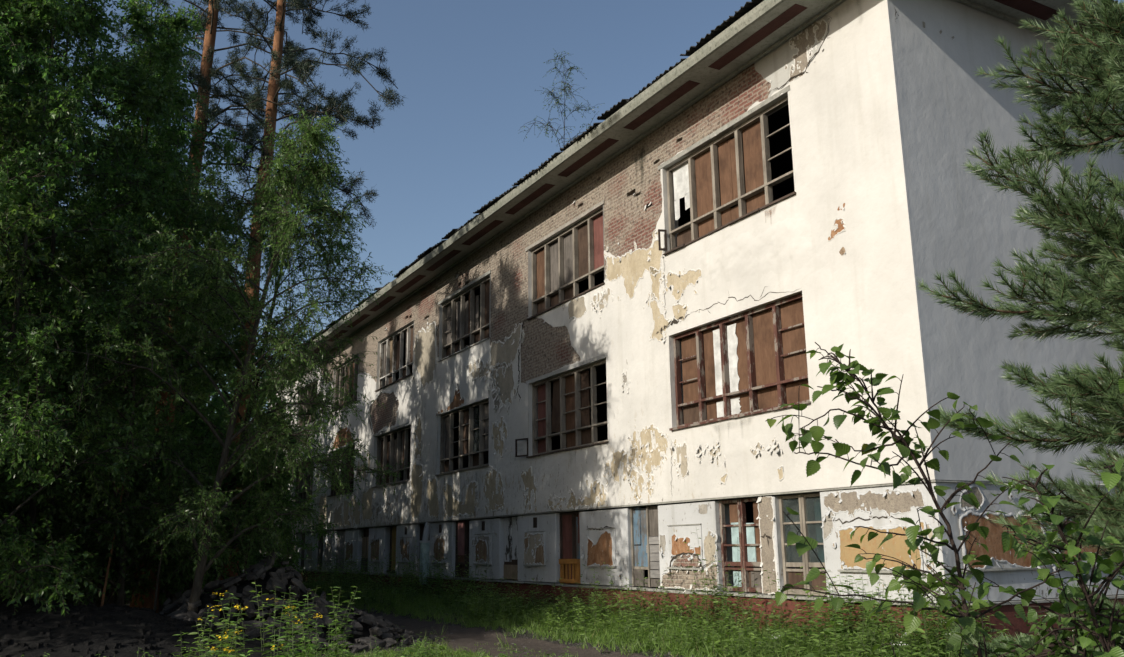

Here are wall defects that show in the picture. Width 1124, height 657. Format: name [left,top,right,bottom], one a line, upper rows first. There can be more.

flaking render [320,15,830,434]
peeling [827,203,847,255]
crack [656,265,798,334]
flaking render [328,423,354,452]
peeling [318,452,371,562]
peeling [375,415,505,563]
peeling [581,529,621,579]
peeling [521,419,729,514]
flaking render [659,530,719,593]
peeling [821,487,936,574]
peeling [951,484,1122,577]